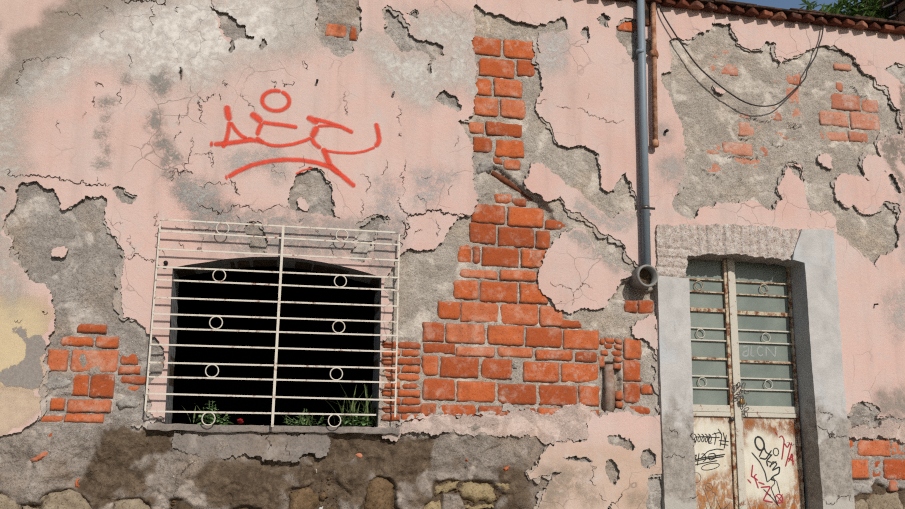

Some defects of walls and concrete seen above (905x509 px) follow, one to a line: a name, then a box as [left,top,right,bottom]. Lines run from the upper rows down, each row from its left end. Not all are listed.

crack [103,0,178,25]
flaking render [886,63,905,85]
flaking render [661,24,902,263]
crack [7,170,111,186]
crack [109,80,334,262]
flaking render [0,0,662,509]
rust [743,418,797,436]
flaking render [847,401,905,509]
rust [695,471,733,509]
rust [748,474,800,509]